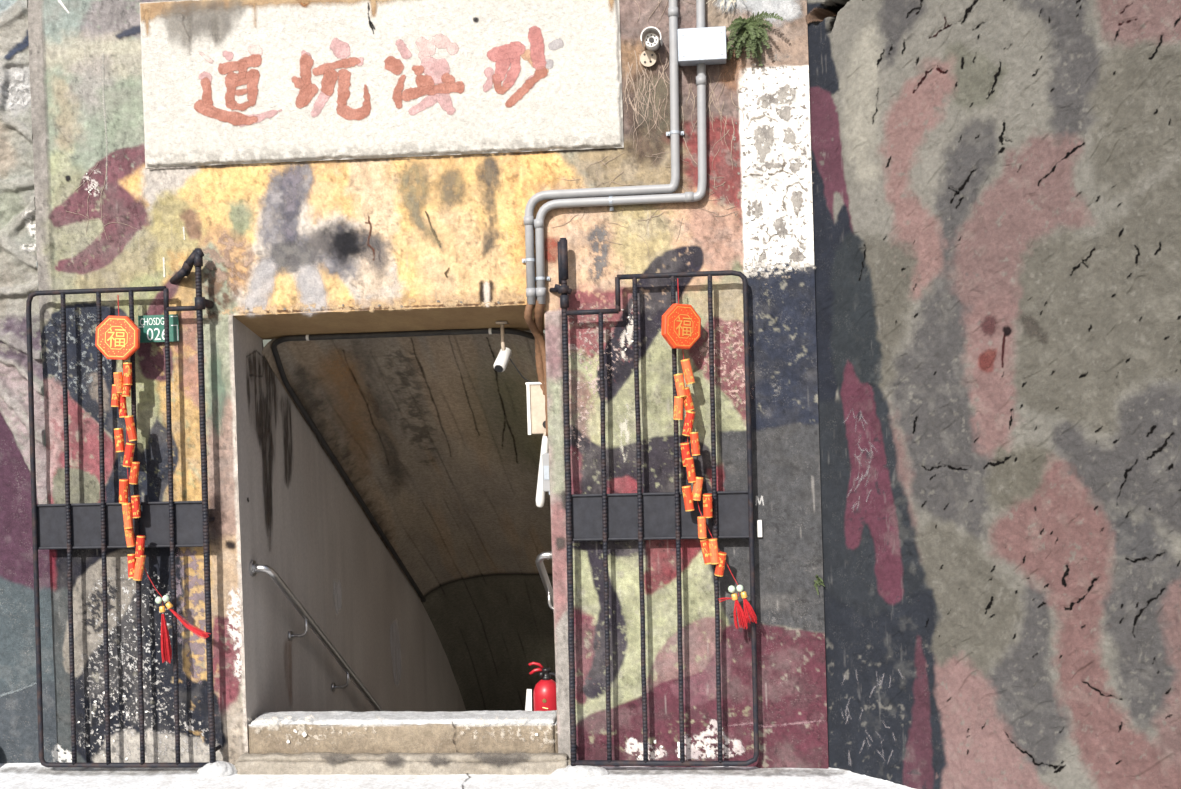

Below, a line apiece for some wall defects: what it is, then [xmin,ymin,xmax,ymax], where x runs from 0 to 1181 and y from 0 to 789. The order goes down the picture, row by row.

leakage [167,2,241,42]
leakage [244,164,385,315]
crack [243,211,524,313]
peeling [733,51,815,288]
leakage [247,353,351,526]
crack [451,337,518,462]